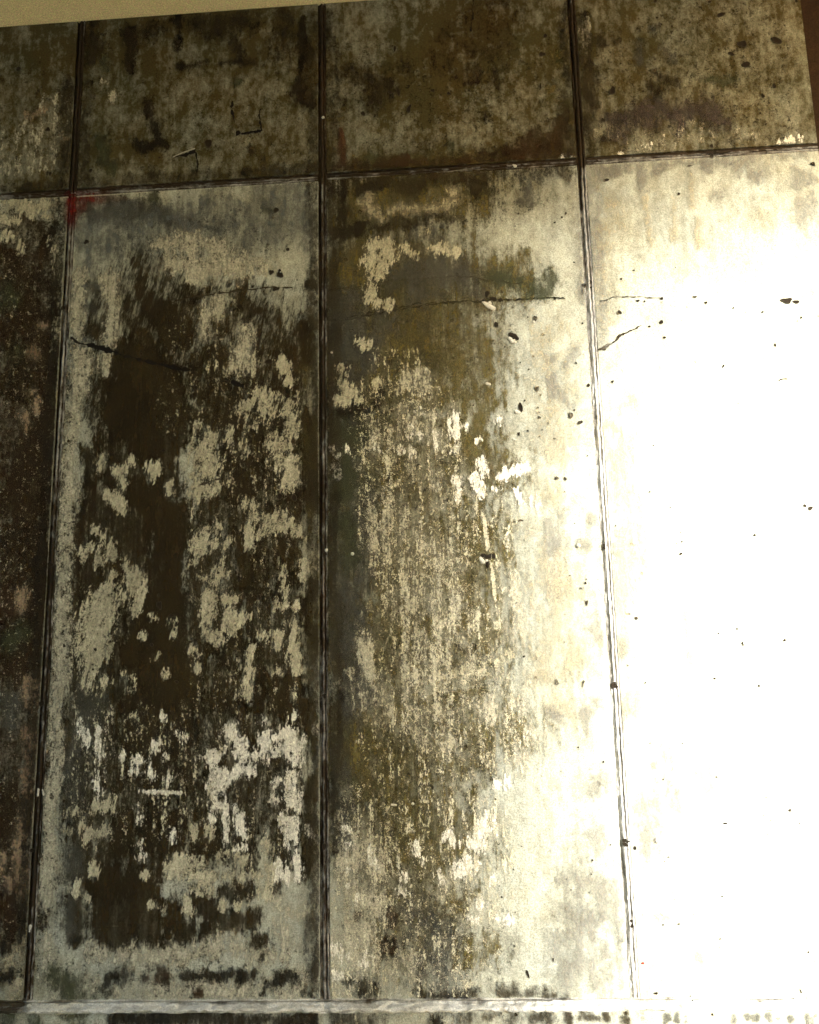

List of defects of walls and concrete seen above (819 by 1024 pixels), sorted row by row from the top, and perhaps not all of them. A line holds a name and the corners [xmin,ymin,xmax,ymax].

crack [332,276,566,321]
crack [600,295,659,303]
crack [70,337,192,372]
crack [598,325,641,350]
water stain [0,12,320,1000]
water stain [326,0,802,998]